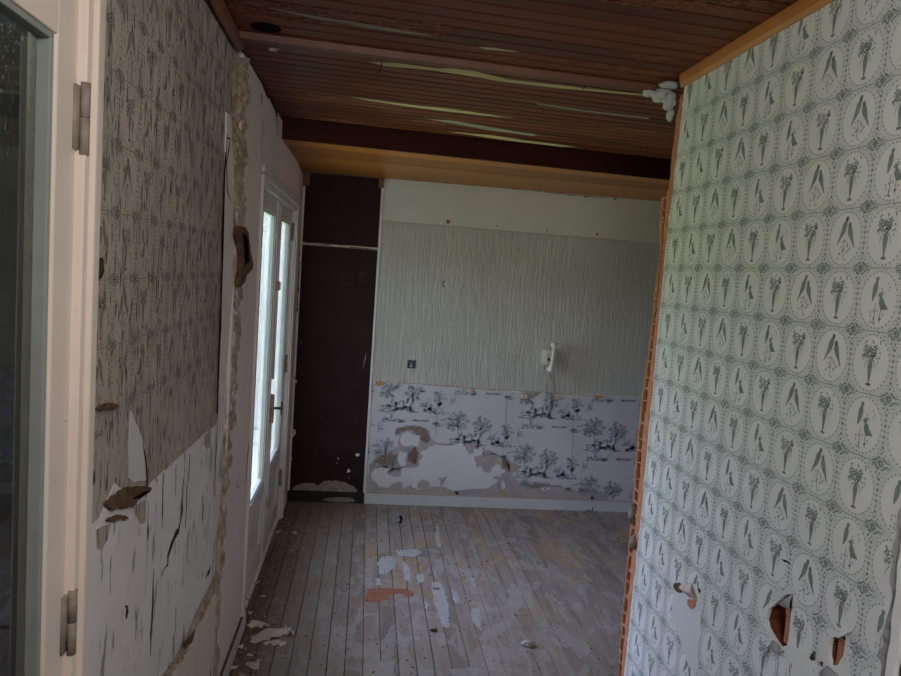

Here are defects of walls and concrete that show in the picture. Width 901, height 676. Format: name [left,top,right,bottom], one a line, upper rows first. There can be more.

peeling [373,432,421,469]
peeling [292,469,357,503]
spalling [163,573,220,676]
spalling [770,585,796,656]
spalling [810,632,850,676]